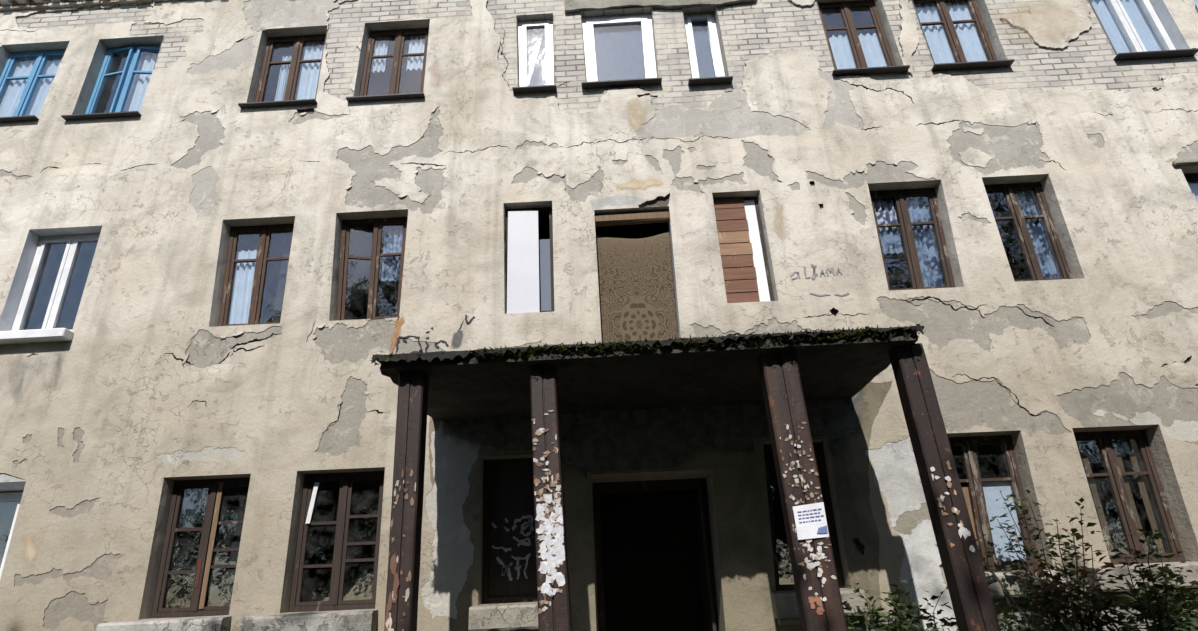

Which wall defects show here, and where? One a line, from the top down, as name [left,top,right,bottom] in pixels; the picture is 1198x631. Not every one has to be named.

flaking render [15,0,1198,225]
peeling [181,326,282,368]
peeling [690,308,840,338]
peeling [877,296,1091,352]
peeling [1132,301,1198,319]
peeling [57,427,85,463]
peeling [313,318,445,456]
peeling [929,368,1198,445]
peeling [49,497,101,518]
peeling [384,421,480,631]
peeling [532,410,565,614]
peeling [14,553,122,631]